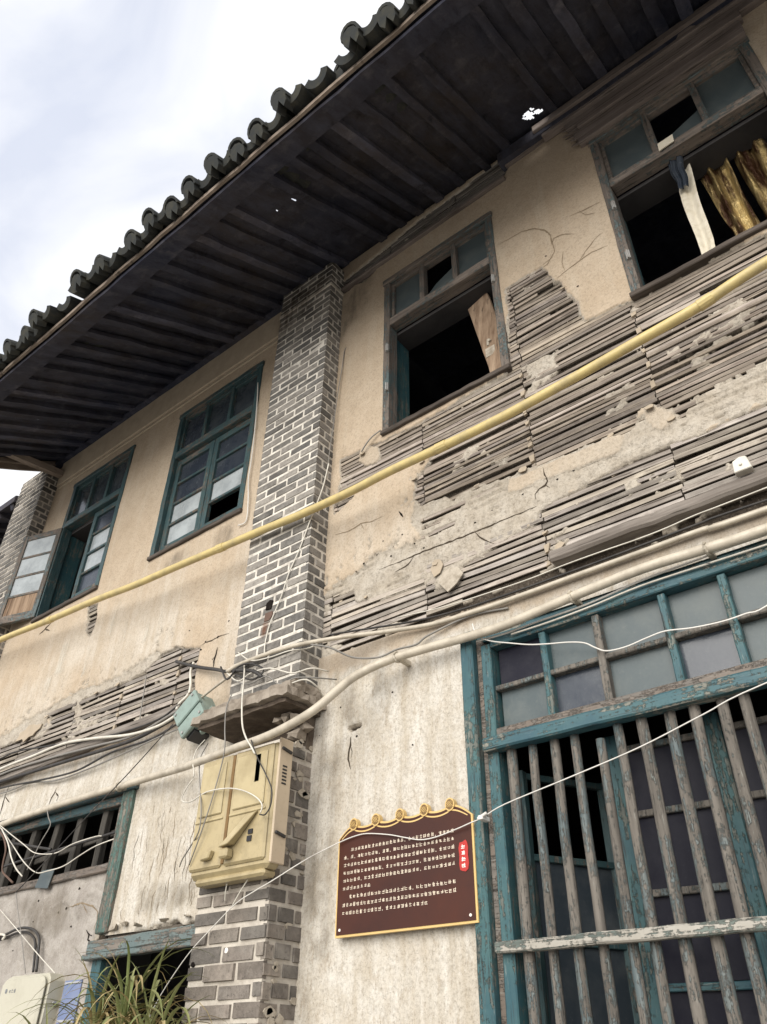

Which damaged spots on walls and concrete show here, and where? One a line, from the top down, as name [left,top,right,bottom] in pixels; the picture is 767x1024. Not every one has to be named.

crack [506,201,608,278]
flaking render [319,228,767,664]
crack [384,468,550,571]
flaking render [83,602,101,640]
flaking render [0,630,219,773]
spalling [272,712,320,741]
flaking render [89,907,198,941]